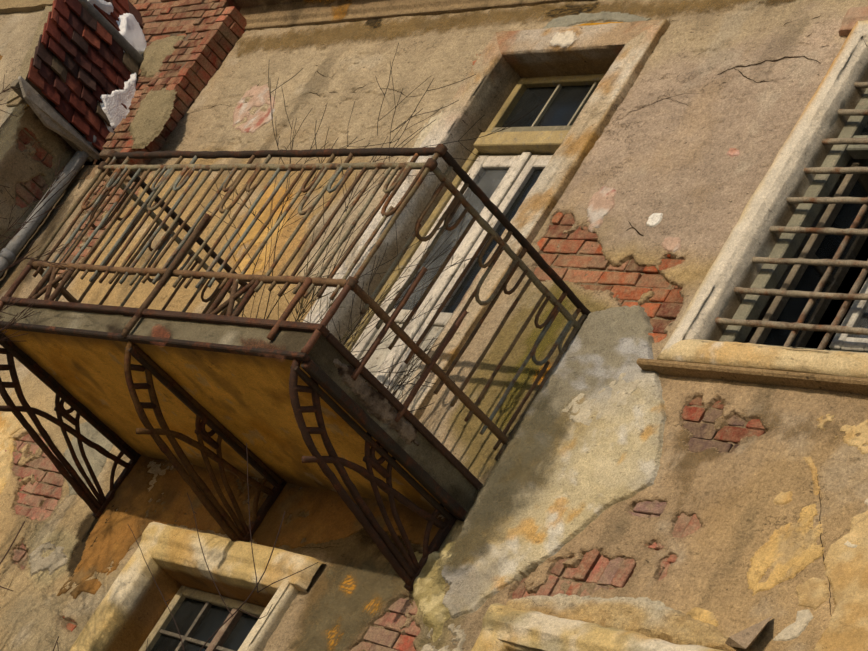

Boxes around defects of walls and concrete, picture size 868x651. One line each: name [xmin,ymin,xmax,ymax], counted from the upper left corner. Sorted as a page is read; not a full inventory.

crack [718,16,828,83]
spalling [232,84,276,134]
flaking render [15,128,53,208]
flaking render [534,186,685,343]
flaking render [682,397,767,453]
flaking render [0,412,114,521]
peeling [13,455,446,599]
water stain [439,391,564,572]
flaking render [512,549,636,599]
flaking render [629,500,667,518]
peeling [746,457,868,651]
flaking render [350,597,466,651]